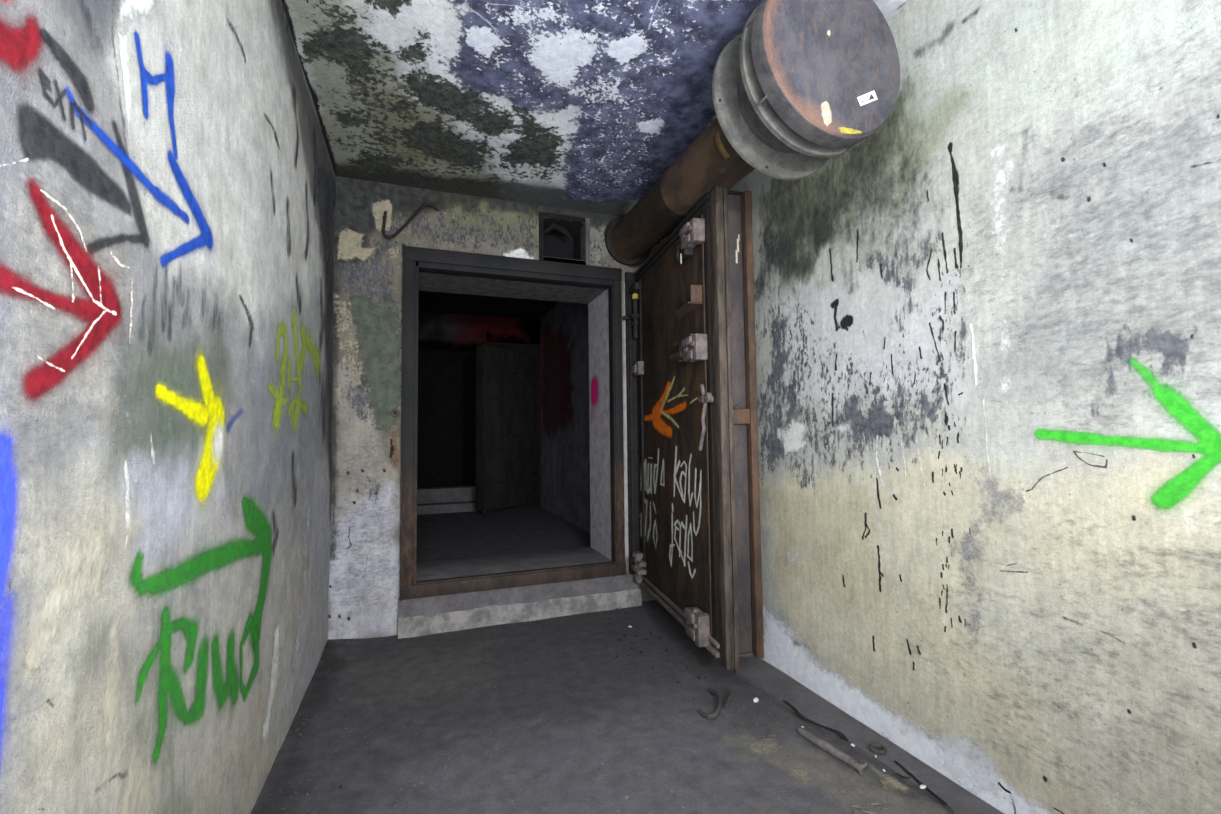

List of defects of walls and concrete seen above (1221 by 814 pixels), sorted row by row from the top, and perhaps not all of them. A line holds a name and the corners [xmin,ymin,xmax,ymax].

peeling [337,199,399,261]
damp [270,0,619,558]
peeling [503,248,534,259]
damp [831,143,967,376]
peeling [986,144,1013,254]
peeling [334,295,366,383]
peeling [777,419,806,455]
damp [756,304,963,495]
peeling [969,323,978,385]
damp [862,478,897,592]
damp [763,605,1051,814]